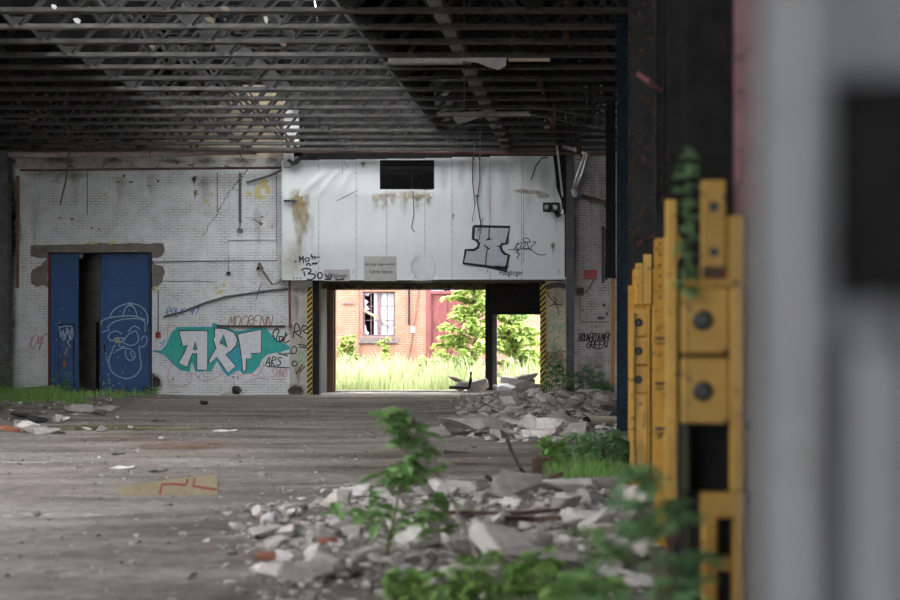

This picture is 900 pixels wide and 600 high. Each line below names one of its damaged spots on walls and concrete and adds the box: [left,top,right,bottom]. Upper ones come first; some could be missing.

crack [203,169,248,236]
corrosion [292,195,307,228]
flaking render [12,241,165,291]